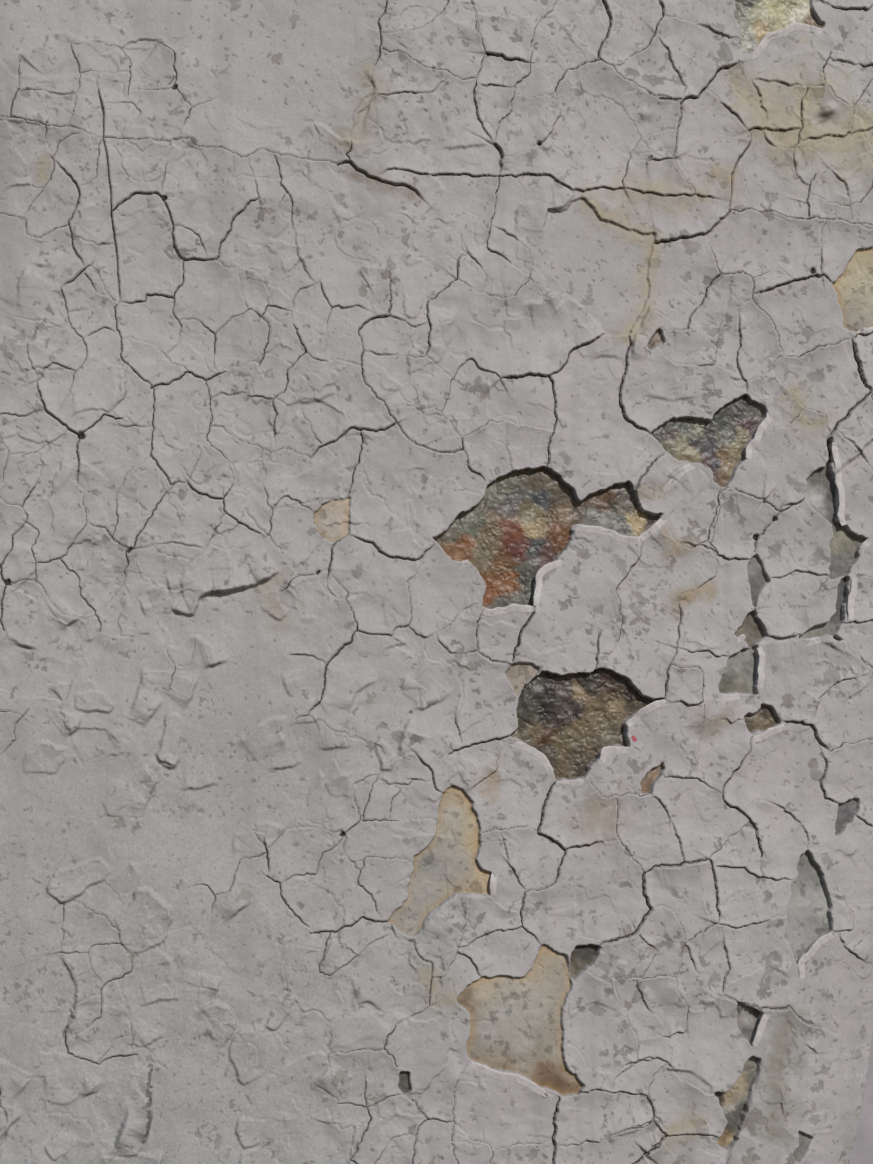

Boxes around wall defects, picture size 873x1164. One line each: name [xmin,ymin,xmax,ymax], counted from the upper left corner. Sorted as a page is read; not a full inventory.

peeling [734,0,823,60]
crack [0,0,873,630]
peeling [651,396,772,493]
crack [281,535,434,721]
crack [443,612,534,664]
peeling [434,467,667,616]
crack [665,487,804,717]
peeling [509,669,671,787]
crack [784,657,873,825]
peeling [389,786,497,936]
crack [199,720,790,1164]
peeling [457,945,583,1097]